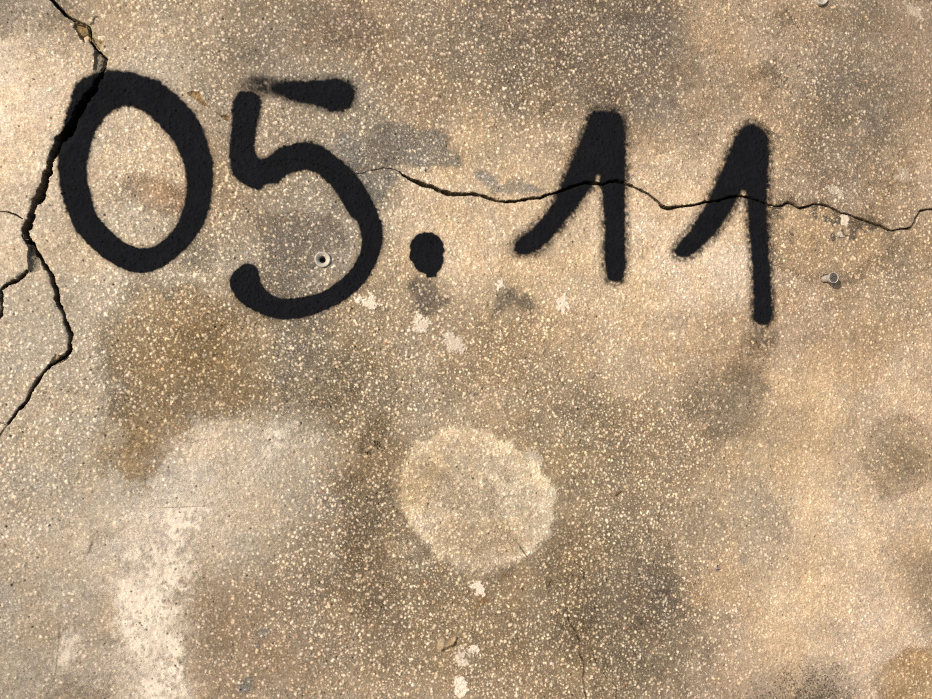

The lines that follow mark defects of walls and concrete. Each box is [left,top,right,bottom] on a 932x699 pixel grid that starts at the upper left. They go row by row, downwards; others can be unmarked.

crack [0,0,108,435]
crack [261,159,932,232]
damp [58,630,80,665]
damp [101,486,225,699]